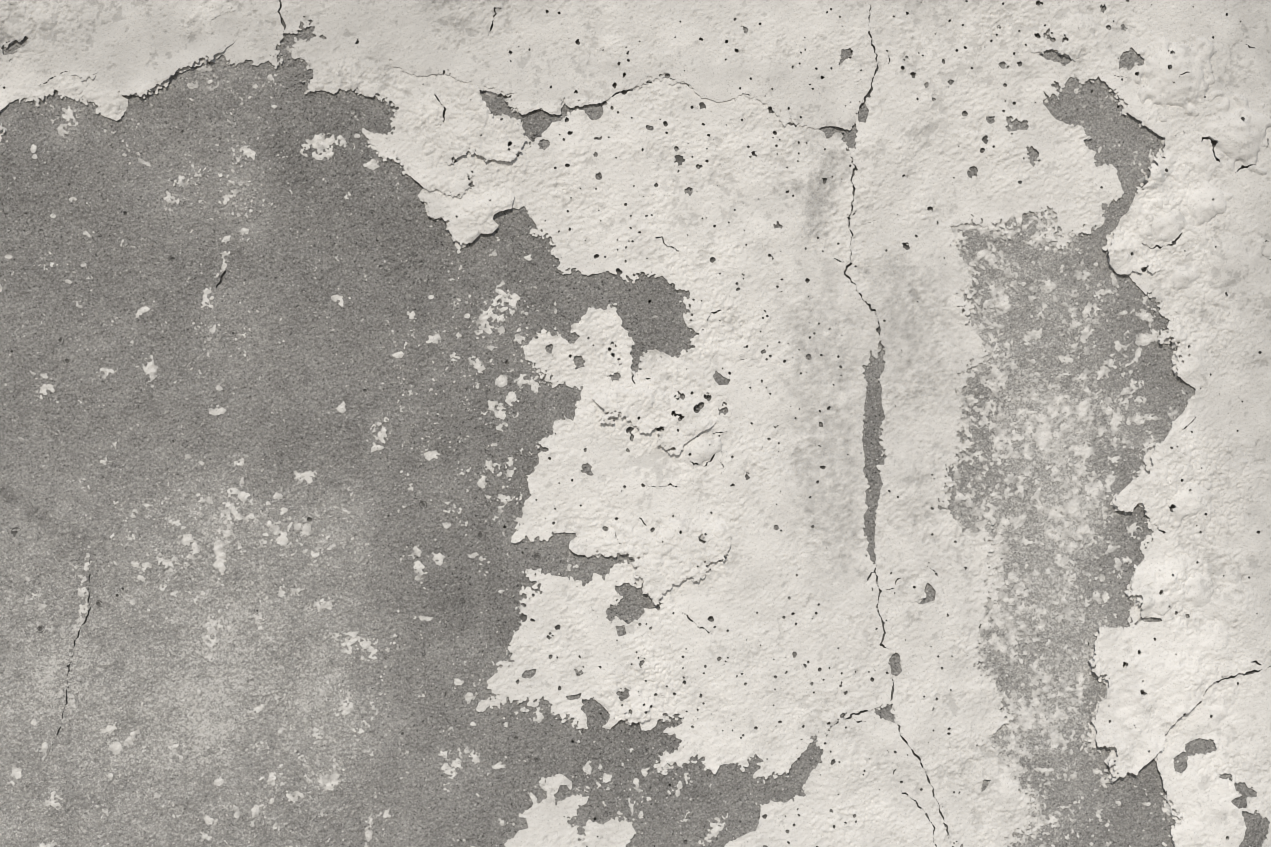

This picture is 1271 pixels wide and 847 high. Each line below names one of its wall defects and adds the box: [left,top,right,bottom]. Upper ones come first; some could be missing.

crack [278,0,286,30]
crack [834,157,880,335]
peeling [0,16,829,847]
crack [652,432,723,487]
peeling [931,29,1195,847]
crack [867,566,934,648]
crack [1165,660,1270,735]
crack [828,679,949,847]
peeling [1173,738,1217,773]
peeling [1219,773,1270,847]